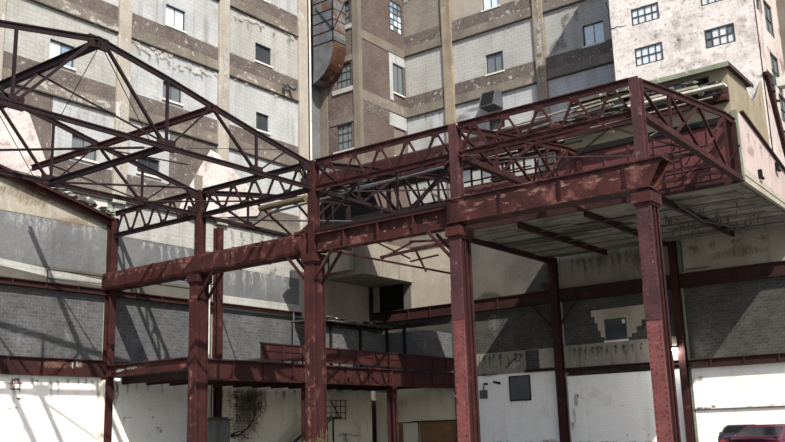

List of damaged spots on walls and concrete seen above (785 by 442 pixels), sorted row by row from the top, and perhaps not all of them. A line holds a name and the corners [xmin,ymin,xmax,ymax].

peeling [131,29,287,119]